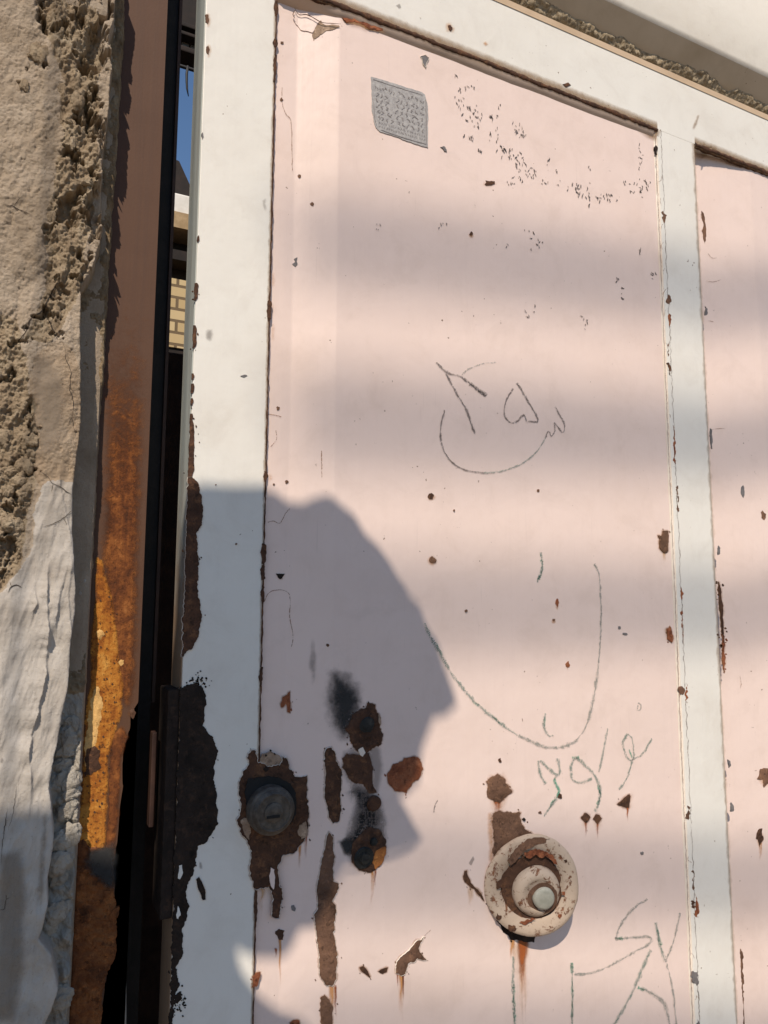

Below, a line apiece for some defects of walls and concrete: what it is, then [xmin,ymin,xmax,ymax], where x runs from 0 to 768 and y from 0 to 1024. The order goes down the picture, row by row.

spalling [0,0,101,591]
rust [69,390,140,1024]
peeling [168,670,218,1024]
rust [236,748,311,965]
rust [311,702,430,1024]
rust [496,914,536,972]
rust [483,758,567,867]
rust [657,529,670,553]
rust [716,581,728,674]